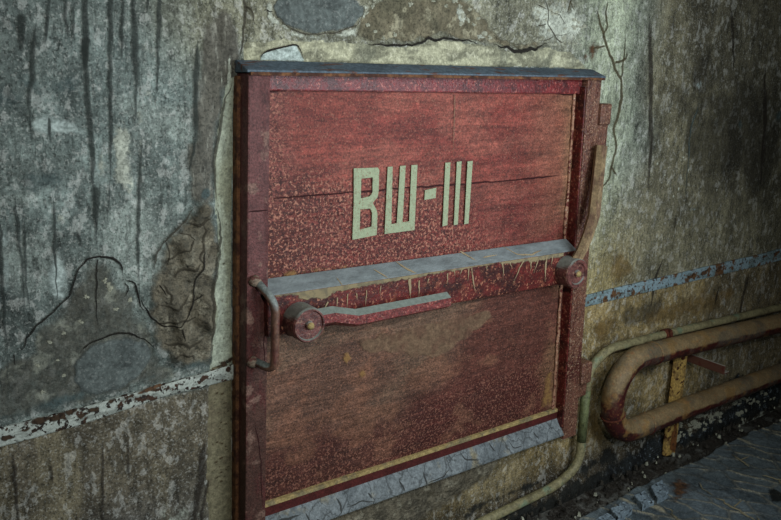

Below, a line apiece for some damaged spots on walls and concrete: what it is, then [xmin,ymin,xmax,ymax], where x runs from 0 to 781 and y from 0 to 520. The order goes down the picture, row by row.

flaking render [261,0,587,61]
crack [593,3,627,186]
crack [13,209,206,364]